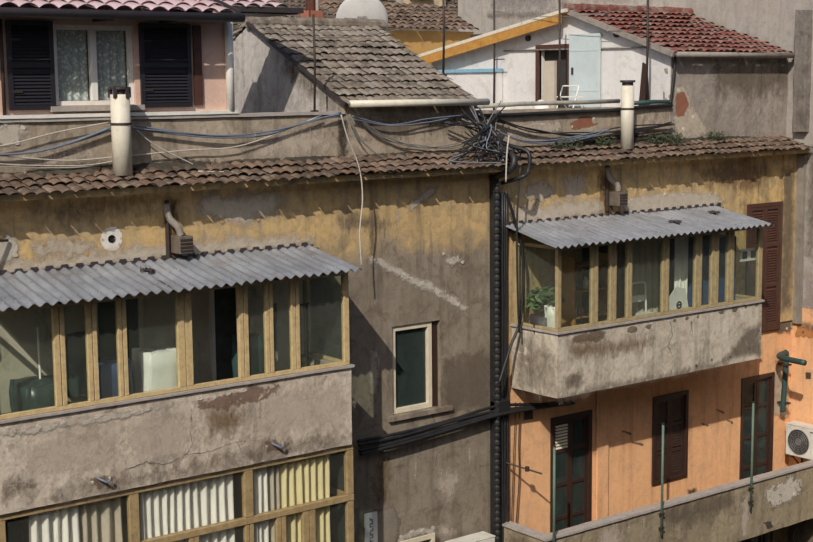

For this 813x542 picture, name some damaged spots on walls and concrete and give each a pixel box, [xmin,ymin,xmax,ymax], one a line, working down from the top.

flaking render [514,116,598,138]
flaking render [673,86,707,138]
peeling [573,330,605,342]
damp [572,340,645,356]
flaking render [730,327,760,358]
peeling [770,310,813,338]
flaking render [197,381,279,411]
peeling [774,360,789,418]
crack [124,435,248,471]
peeling [764,474,804,508]